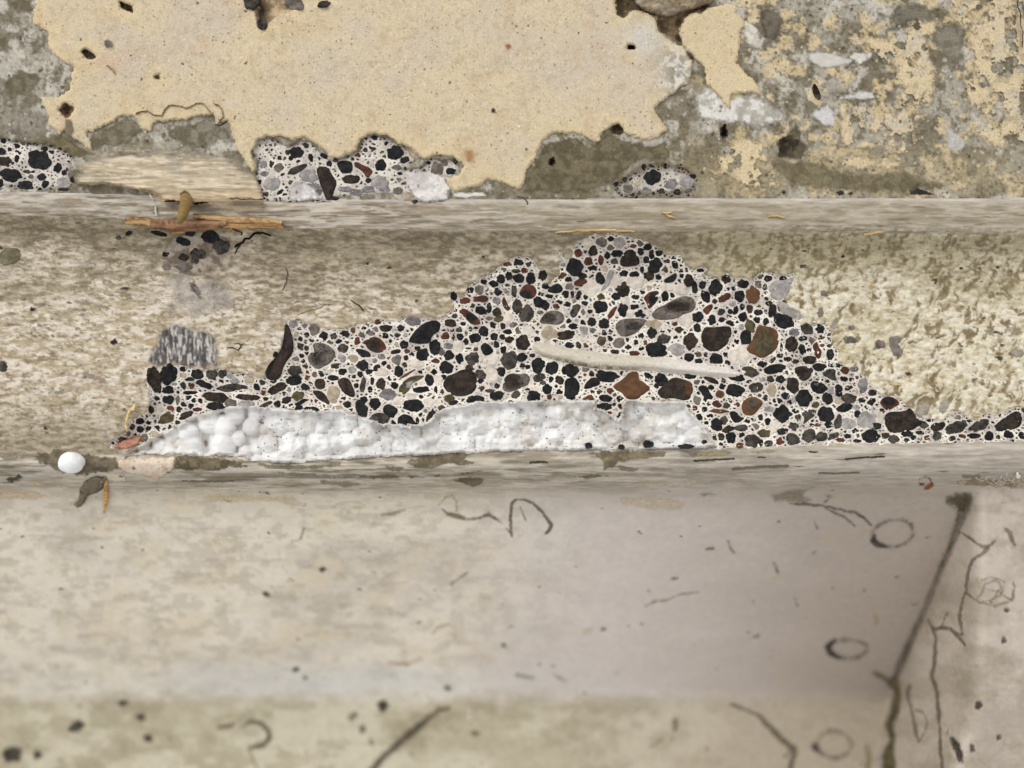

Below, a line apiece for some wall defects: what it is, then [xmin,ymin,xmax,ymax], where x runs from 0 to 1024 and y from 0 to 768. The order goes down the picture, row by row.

spalling [0,138,75,191]
peeling [32,0,761,204]
peeling [713,119,811,190]
peeling [837,0,1024,170]
spalling [105,230,1024,482]
crack [905,528,1016,768]